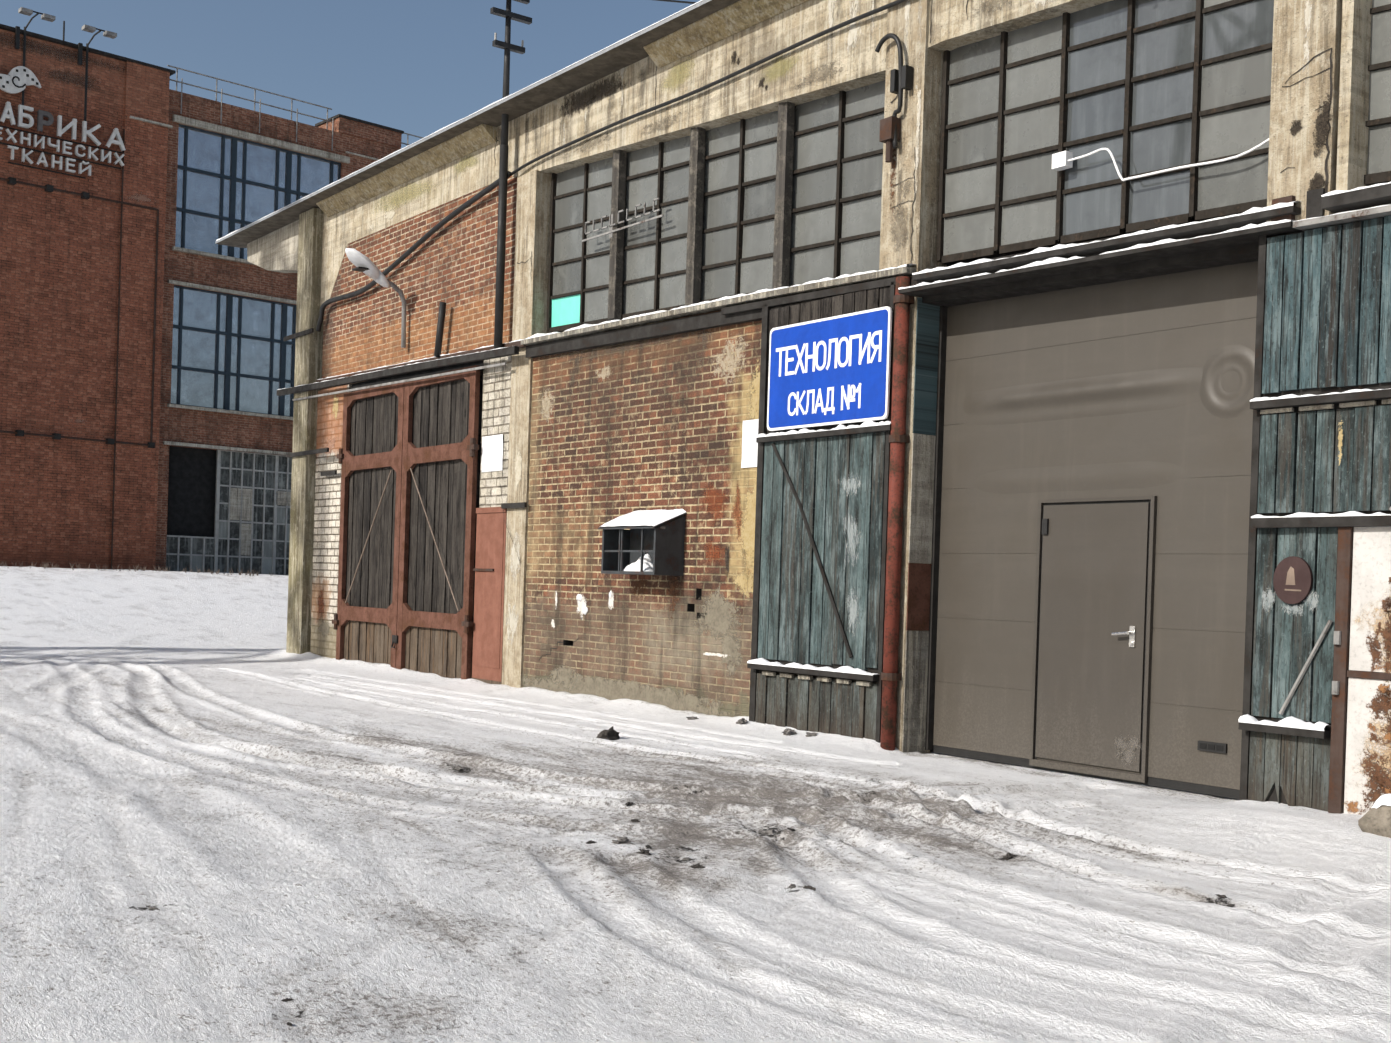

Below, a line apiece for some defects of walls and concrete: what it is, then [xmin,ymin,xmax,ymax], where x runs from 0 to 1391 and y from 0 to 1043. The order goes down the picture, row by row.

spalling [975,0,1012,12]
corrosion [1344,577,1391,815]